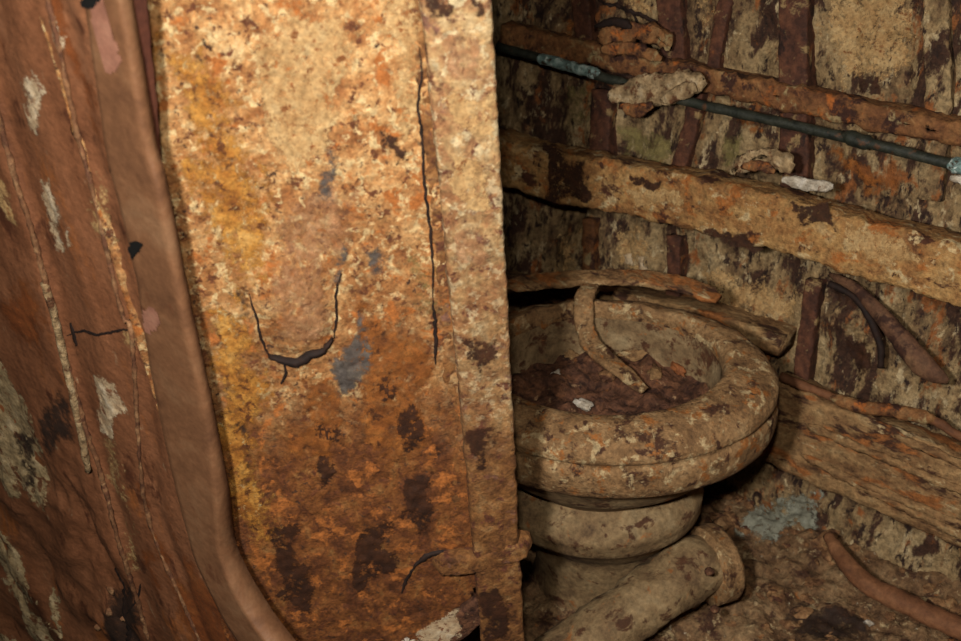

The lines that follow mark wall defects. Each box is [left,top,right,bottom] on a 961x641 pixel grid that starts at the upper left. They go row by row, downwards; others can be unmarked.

corrosion [426,0,454,18]
corrosion [594,17,708,118]
peeling [20,75,46,135]
corrosion [379,131,408,165]
corrosion [629,176,661,192]
corrosion [790,201,836,232]
crack [67,322,128,346]
corrosion [153,22,315,614]
crack [249,273,342,384]
corrosion [461,338,498,373]
peeling [0,358,54,512]
corrosion [352,472,434,592]